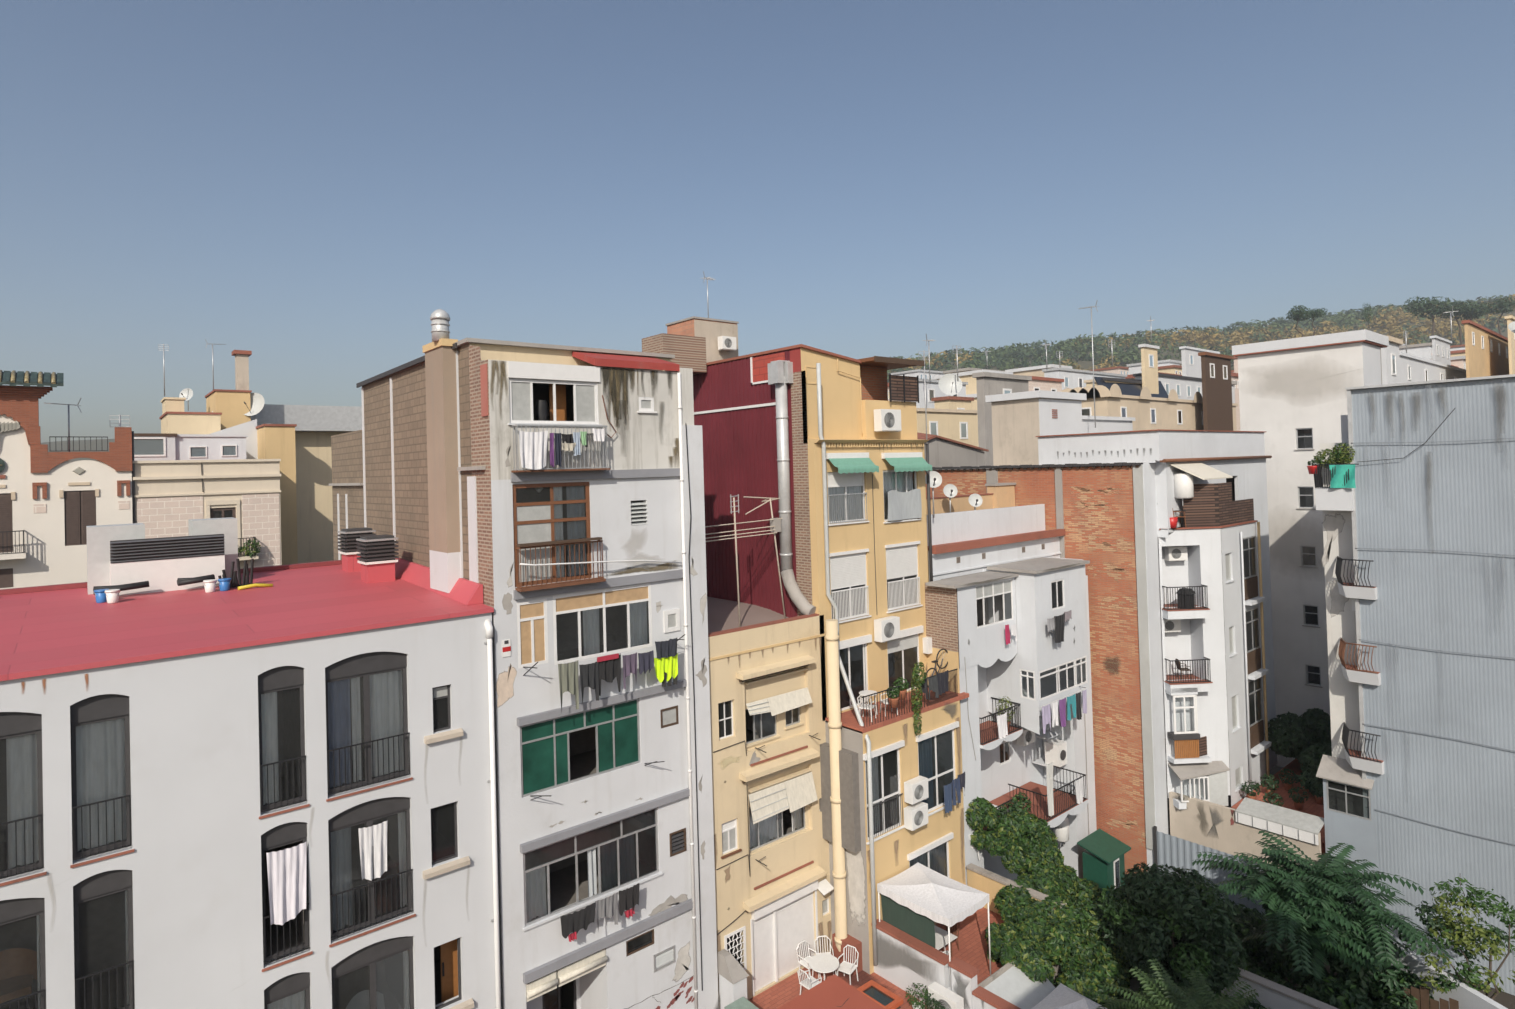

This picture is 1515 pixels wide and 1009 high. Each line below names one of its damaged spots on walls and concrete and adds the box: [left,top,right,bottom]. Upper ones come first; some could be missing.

leakage [491,360,507,400]
leakage [602,368,654,409]